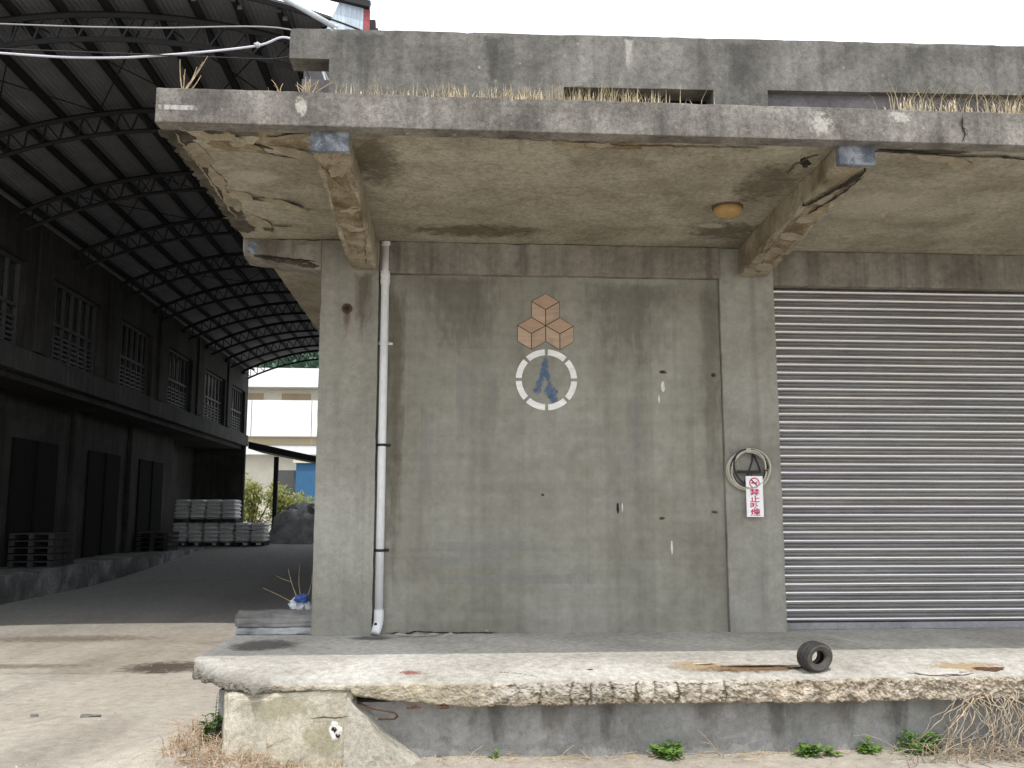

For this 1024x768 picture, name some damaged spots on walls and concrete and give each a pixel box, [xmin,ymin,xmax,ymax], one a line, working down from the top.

spalling [158,129,371,264]
spalling [753,168,866,273]
leakage [419,226,530,237]
rust [682,661,802,672]
rust [934,663,996,671]